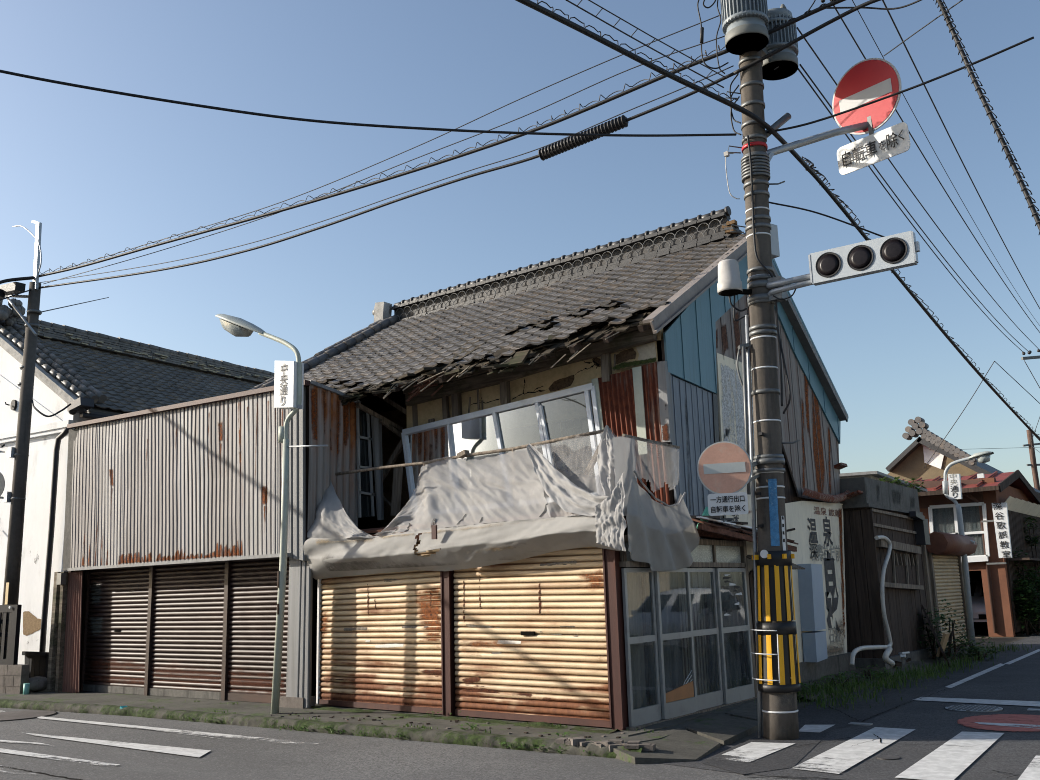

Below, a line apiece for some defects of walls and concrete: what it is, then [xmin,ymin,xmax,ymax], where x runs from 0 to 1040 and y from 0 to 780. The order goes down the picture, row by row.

rust [208,403,258,471]
rust [82,525,243,566]
rust [582,571,604,587]
peeling [23,611,41,643]
rust [416,588,441,641]